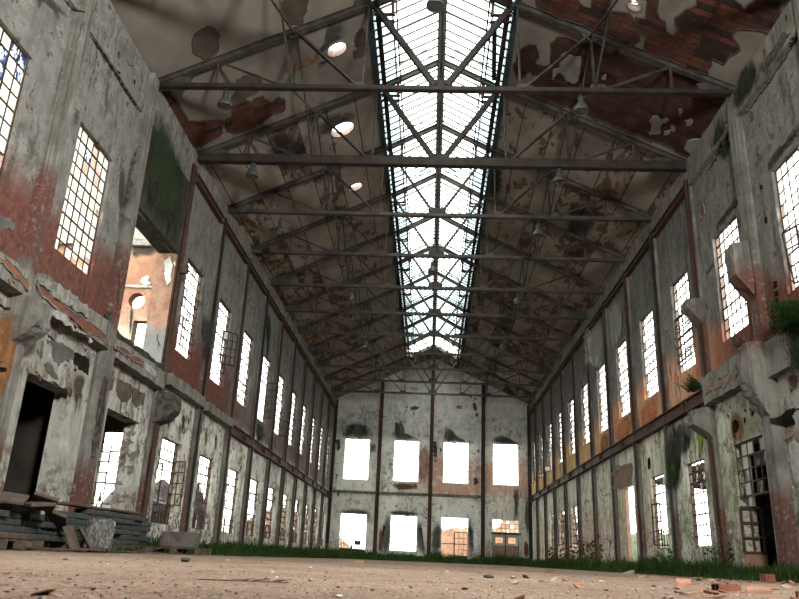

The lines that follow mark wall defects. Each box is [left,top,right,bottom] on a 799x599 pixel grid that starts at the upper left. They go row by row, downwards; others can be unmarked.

flaking render [513,0,785,157]
flaking render [162,73,286,147]
flaking render [0,257,156,377]
flaking render [27,340,90,396]
damp [444,429,465,442]
damp [672,424,691,455]
flaking render [610,463,633,489]